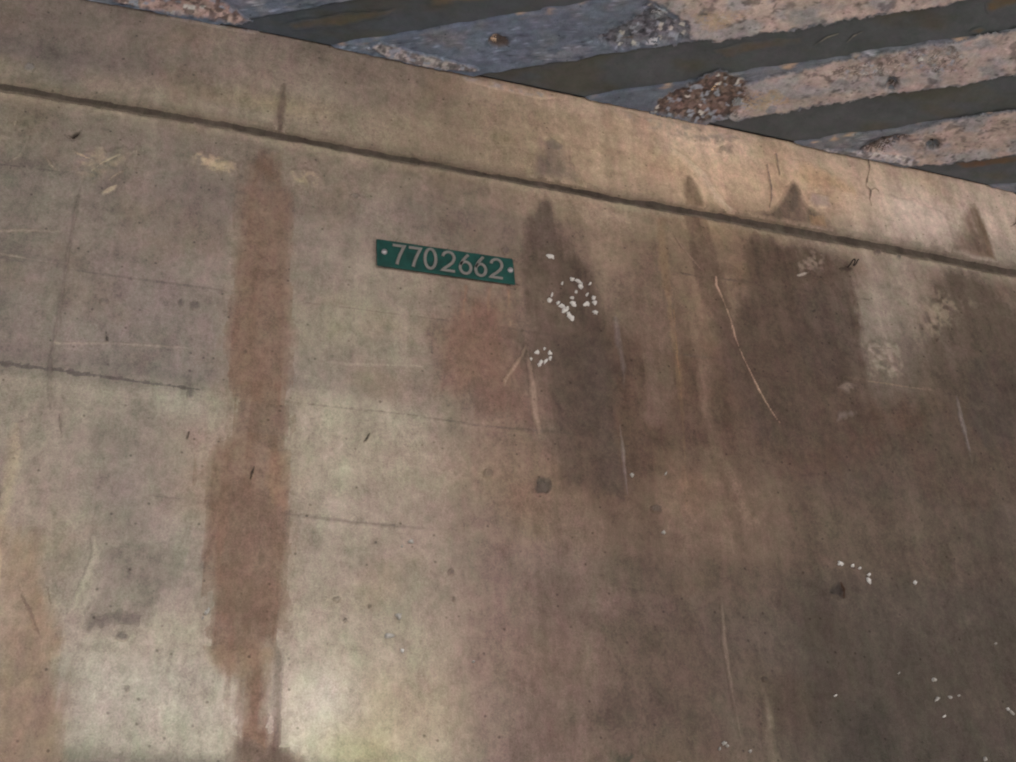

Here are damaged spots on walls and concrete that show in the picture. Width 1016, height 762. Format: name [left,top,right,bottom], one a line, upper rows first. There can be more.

spalling [112,0,253,26]
peeling [588,0,965,51]
peeling [610,28,1016,157]
peeling [819,109,1016,167]
damp [502,136,1016,533]
corrosion [168,146,315,762]
corrosion [0,517,83,762]
damp [539,585,743,761]
damp [790,586,1016,762]